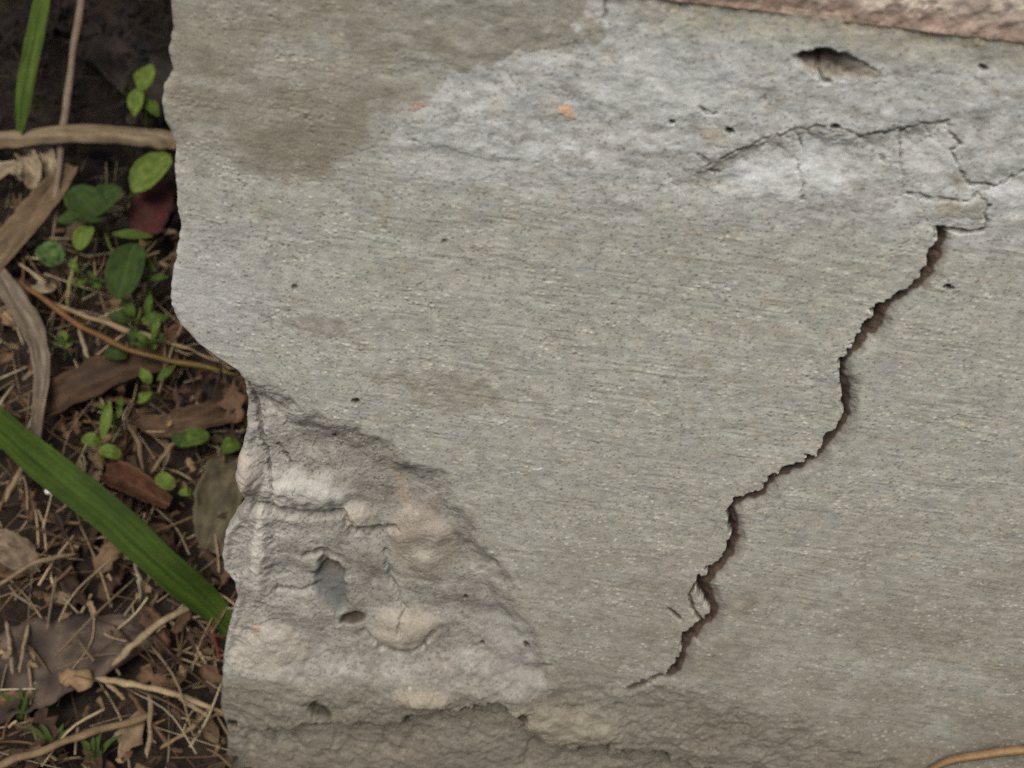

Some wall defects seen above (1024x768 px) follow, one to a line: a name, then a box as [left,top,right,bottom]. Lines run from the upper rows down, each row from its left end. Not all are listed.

spalling [794,47,887,83]
spalling [222,375,555,723]
crack [627,117,1024,693]